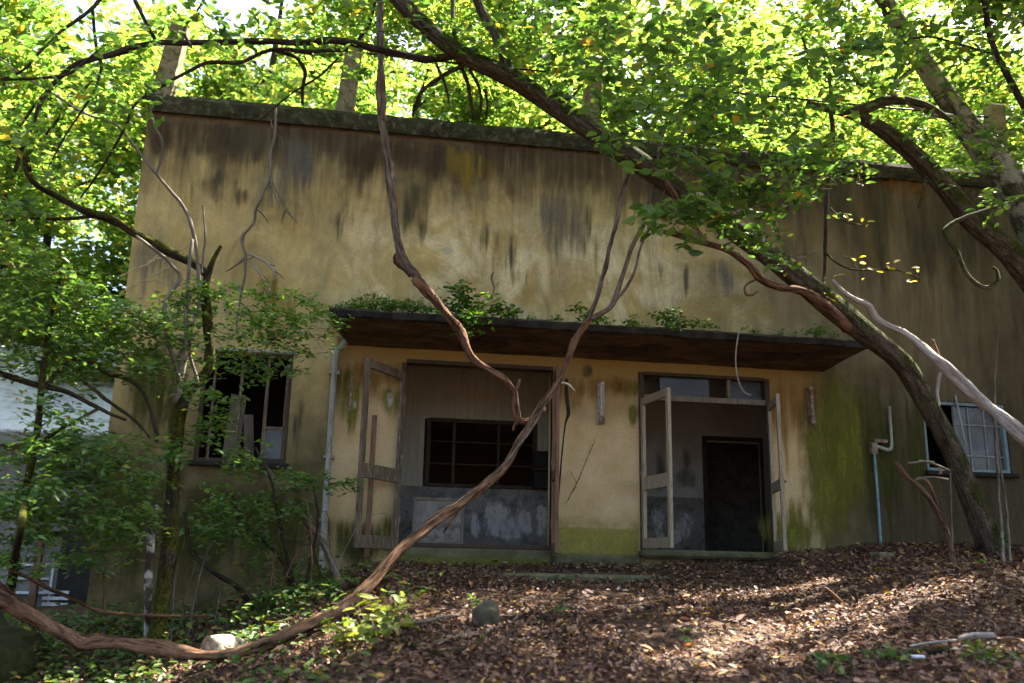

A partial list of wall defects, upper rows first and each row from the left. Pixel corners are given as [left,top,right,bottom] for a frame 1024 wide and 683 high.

damp [337,372,359,429]
damp [768,391,924,552]